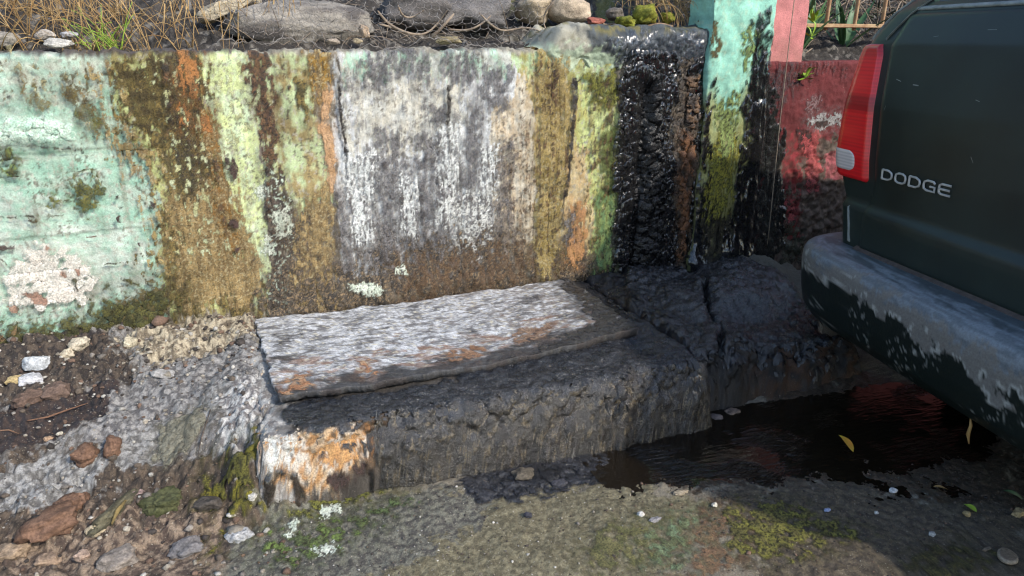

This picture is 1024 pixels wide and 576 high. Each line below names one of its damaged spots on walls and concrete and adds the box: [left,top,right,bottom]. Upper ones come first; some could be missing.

rust [173,49,213,132]
rust [318,89,337,193]
water stain [74,15,742,329]
peeling [2,240,100,313]
rust [276,371,315,395]
rust [445,345,487,363]
rust [512,323,552,346]